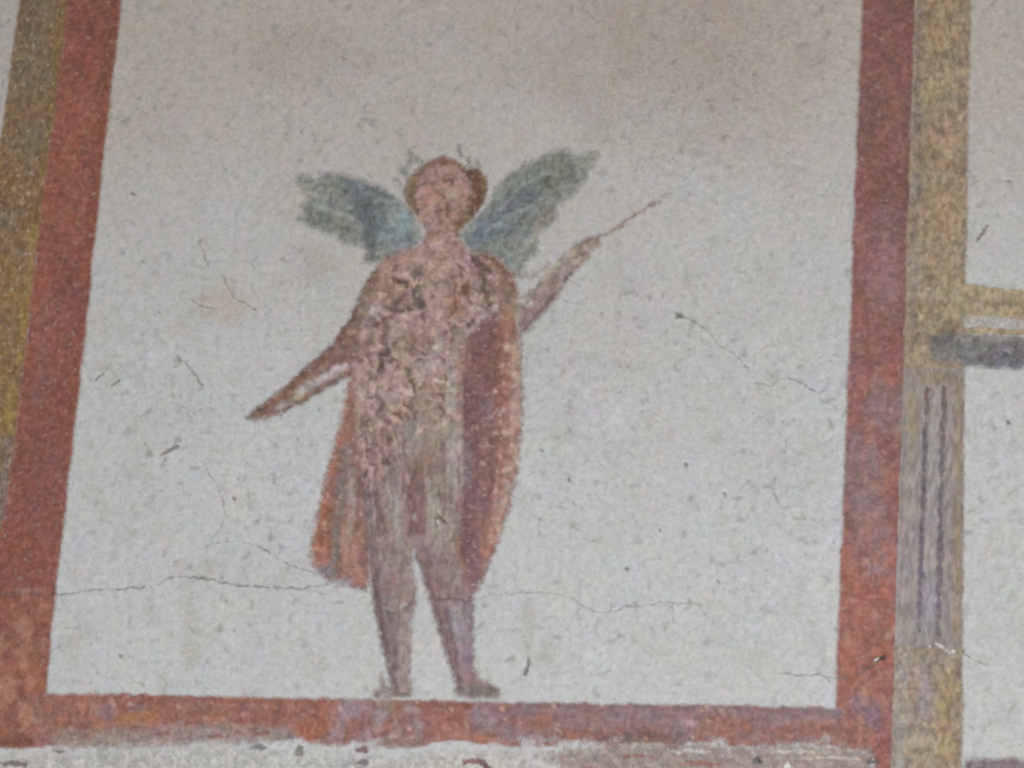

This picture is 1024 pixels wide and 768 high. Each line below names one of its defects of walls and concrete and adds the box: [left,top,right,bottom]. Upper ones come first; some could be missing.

crack [688,318,817,392]
crack [430,591,713,624]
peeling [0,719,881,768]